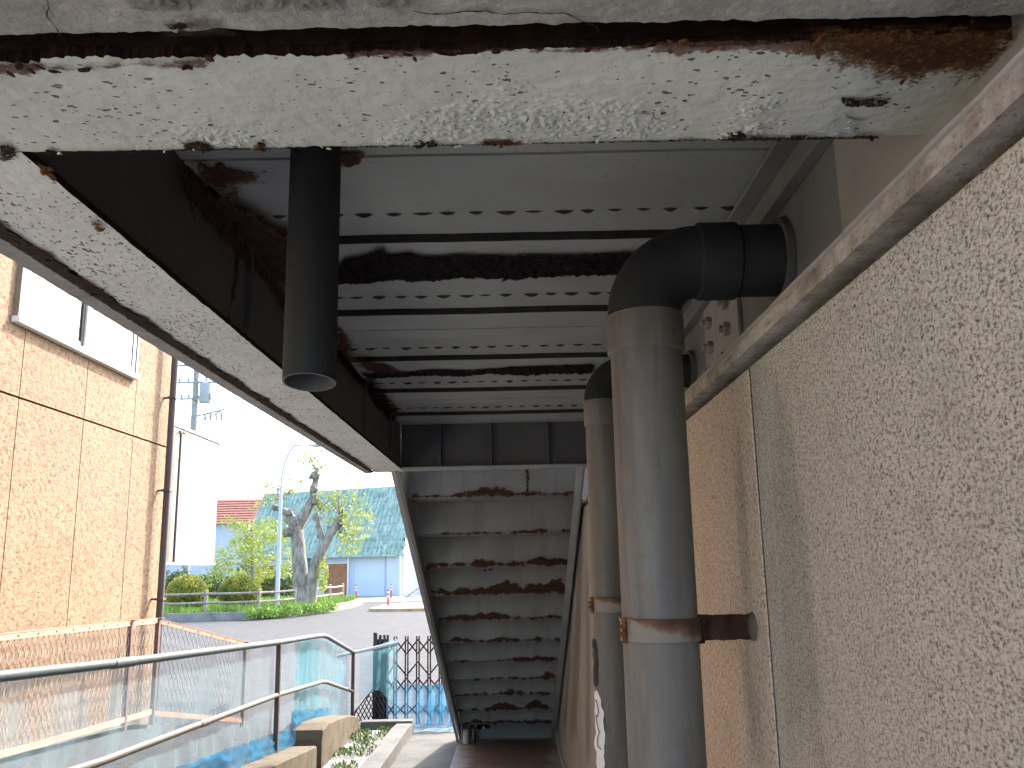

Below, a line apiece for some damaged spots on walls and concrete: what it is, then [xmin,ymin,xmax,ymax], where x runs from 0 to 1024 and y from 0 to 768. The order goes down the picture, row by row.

corrosion [0,15,1017,86]
corrosion [31,131,880,321]
corrosion [0,223,376,473]
corrosion [337,326,595,422]
corrosion [412,469,573,499]
corrosion [425,556,568,572]
corrosion [431,578,565,597]
corrosion [438,612,562,623]
corrosion [448,636,560,726]